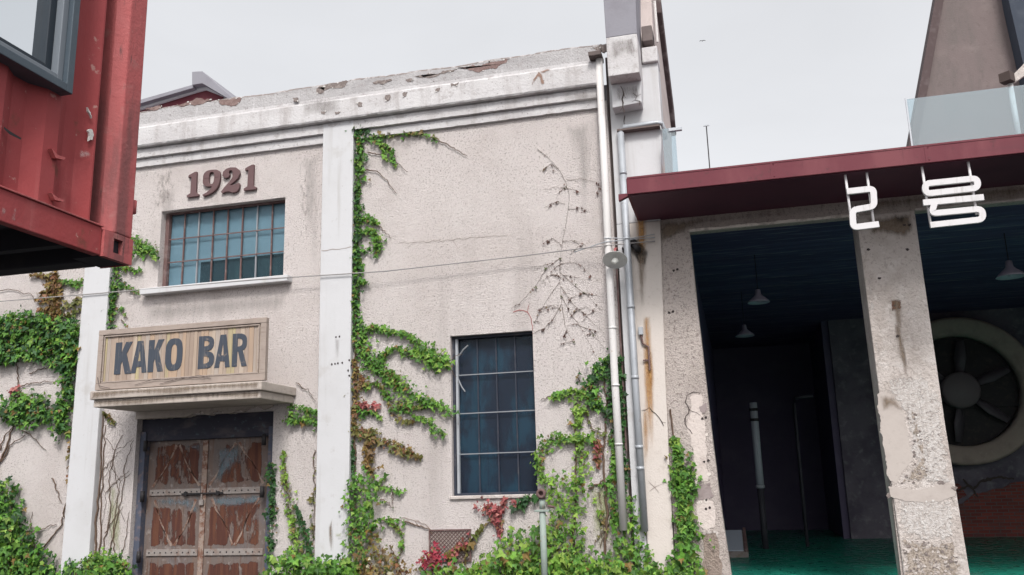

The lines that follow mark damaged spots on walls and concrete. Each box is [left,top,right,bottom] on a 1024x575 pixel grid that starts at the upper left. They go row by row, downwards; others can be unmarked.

spalling [177,97,242,107]
spalling [316,80,348,94]
spalling [373,59,508,102]
flaking render [874,337,1024,575]
peeling [687,394,723,575]
crack [958,476,1014,497]